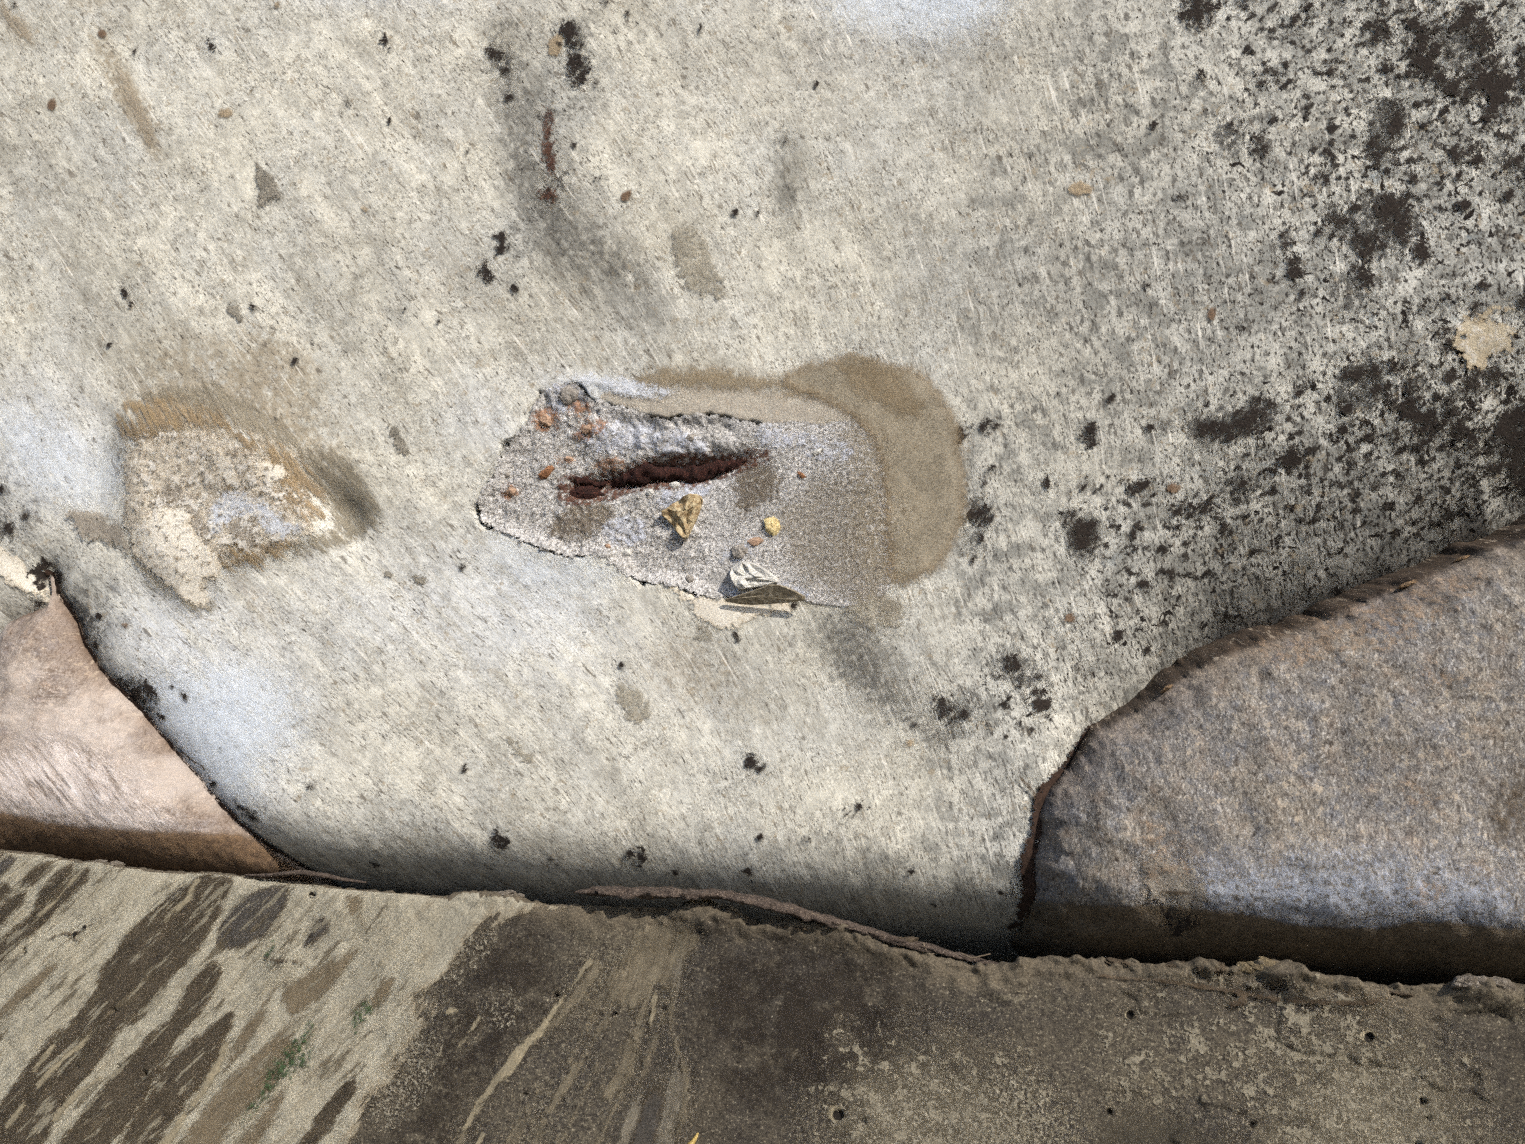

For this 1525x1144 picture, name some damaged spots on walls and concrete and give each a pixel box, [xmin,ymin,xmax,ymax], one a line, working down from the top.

leakage [1177,0,1525,309]
spalling [475,382,894,642]
leakage [576,351,1000,632]
leakage [0,668,359,1144]
leakage [345,895,363,924]
leakage [369,977,395,1008]
leakage [413,922,699,1144]
leakage [702,943,896,1104]